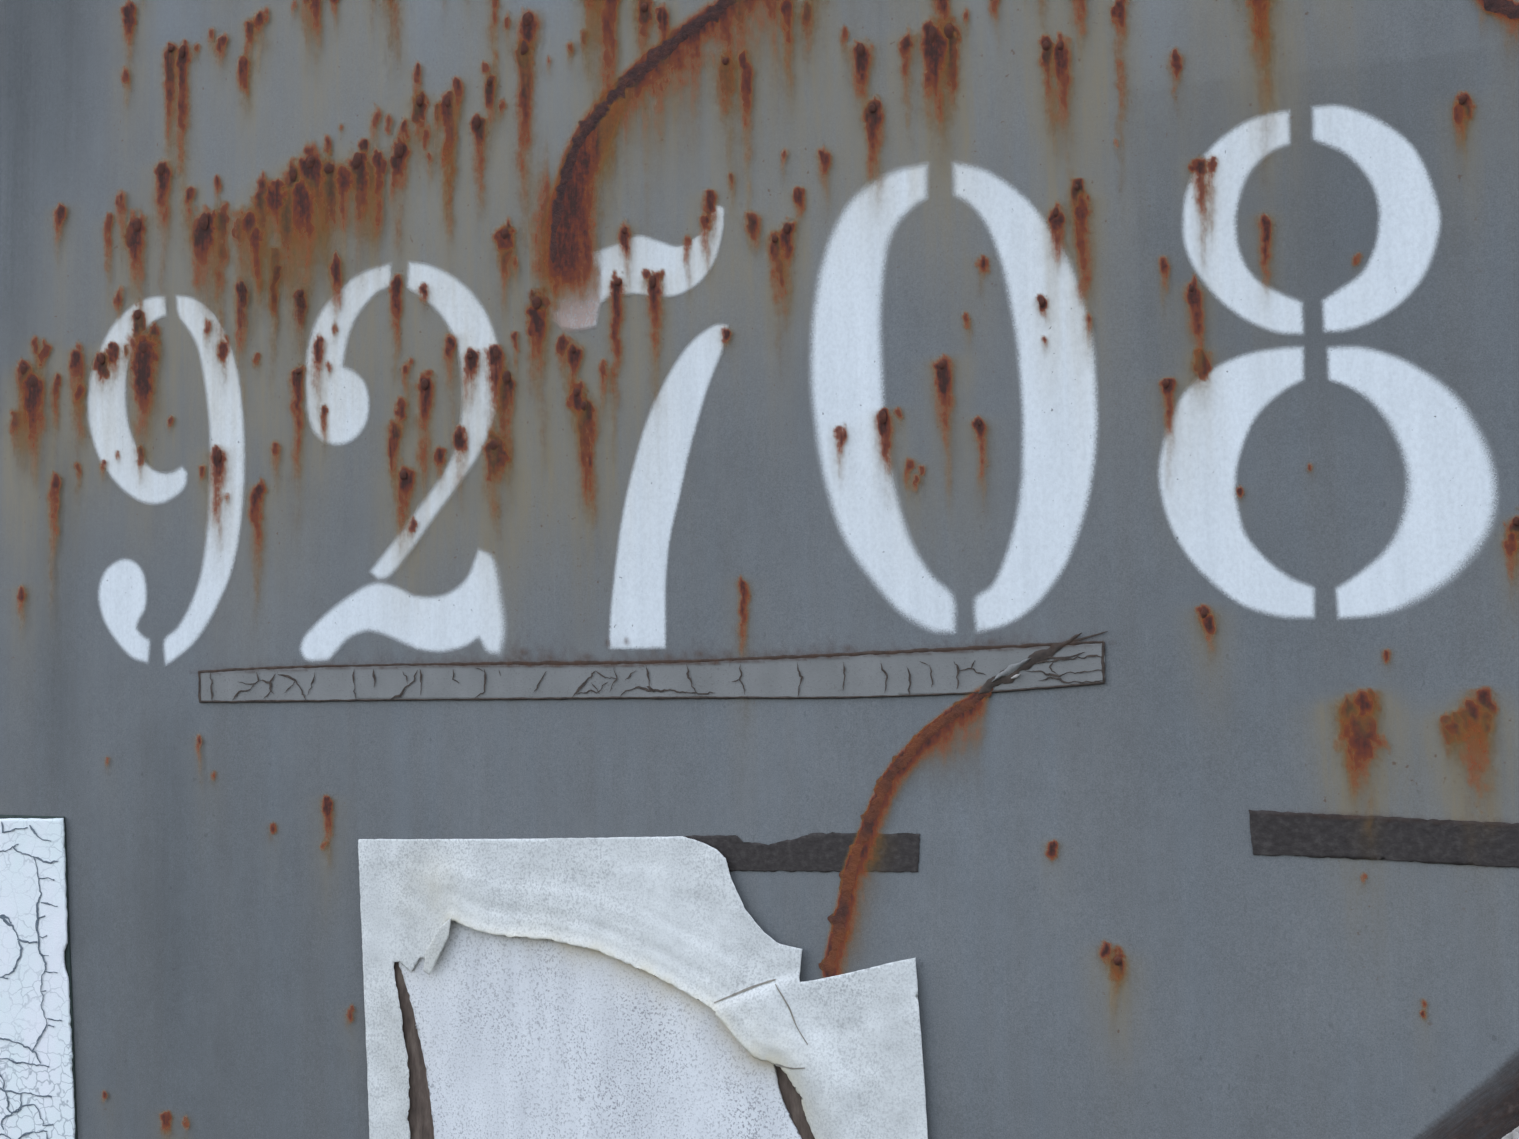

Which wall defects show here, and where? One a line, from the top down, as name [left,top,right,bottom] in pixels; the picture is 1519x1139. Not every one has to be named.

rust [841,26,884,177]
rust [898,0,969,123]
rust [1188,156,1217,220]
rust [10,0,813,559]
rust [1048,178,1092,331]
rust [833,426,847,462]
rust [876,407,925,490]
crack [210,670,315,700]
crack [352,668,501,700]
crack [534,665,745,698]
rust [818,687,993,978]
crack [0,822,62,1139]